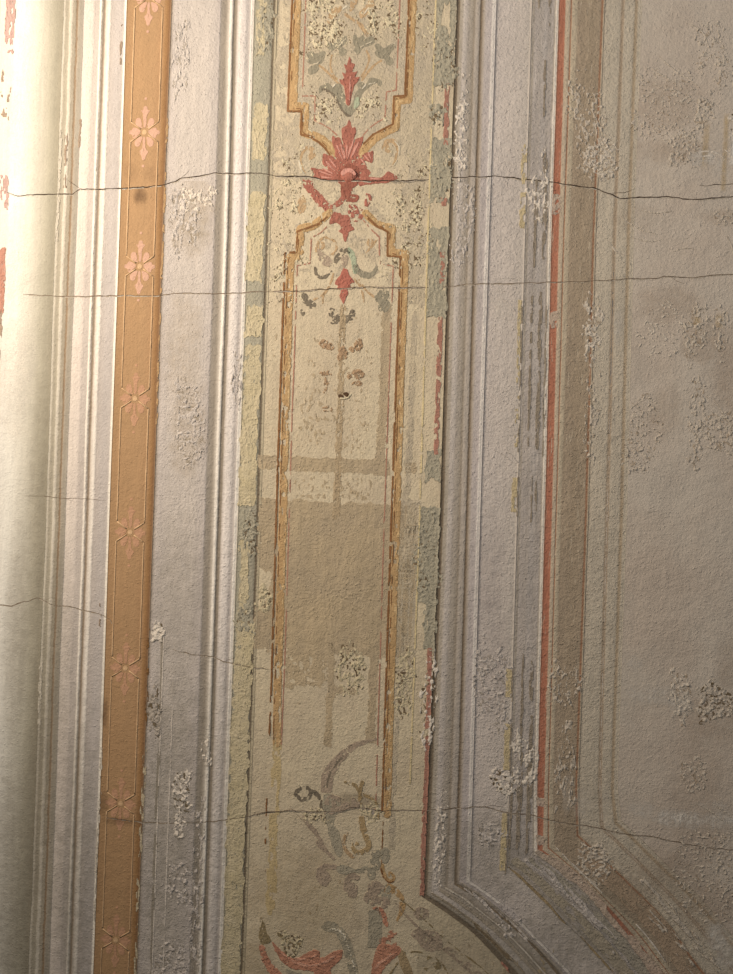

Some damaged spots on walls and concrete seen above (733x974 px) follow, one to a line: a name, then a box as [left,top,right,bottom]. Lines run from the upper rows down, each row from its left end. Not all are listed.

crack [7,170,733,201]
crack [27,274,733,298]
crack [0,597,112,623]
crack [107,805,733,850]